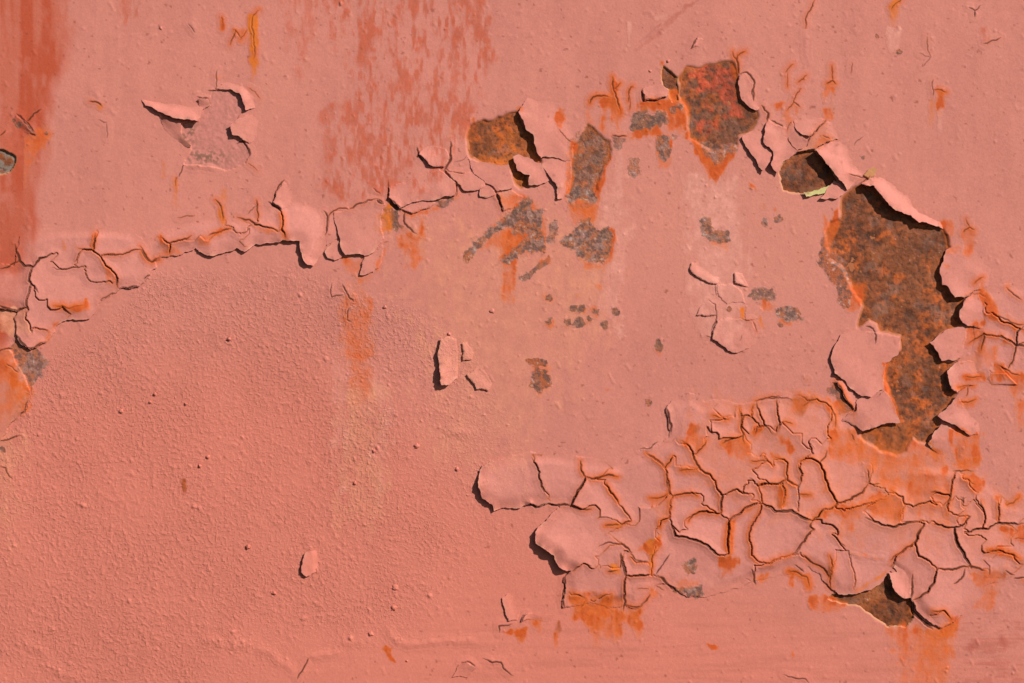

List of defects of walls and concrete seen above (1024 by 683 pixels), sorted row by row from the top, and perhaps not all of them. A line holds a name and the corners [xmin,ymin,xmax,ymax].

peeling [142,63,266,182]
peeling [313,0,614,216]
corrosion [553,107,573,147]
crack [0,116,530,351]
corrosion [462,195,618,307]
corrosion [542,293,620,331]
peeling [690,262,804,353]
peeling [779,141,991,453]
corrosion [0,335,51,565]
corrosion [525,357,553,399]
crack [478,212,1024,651]